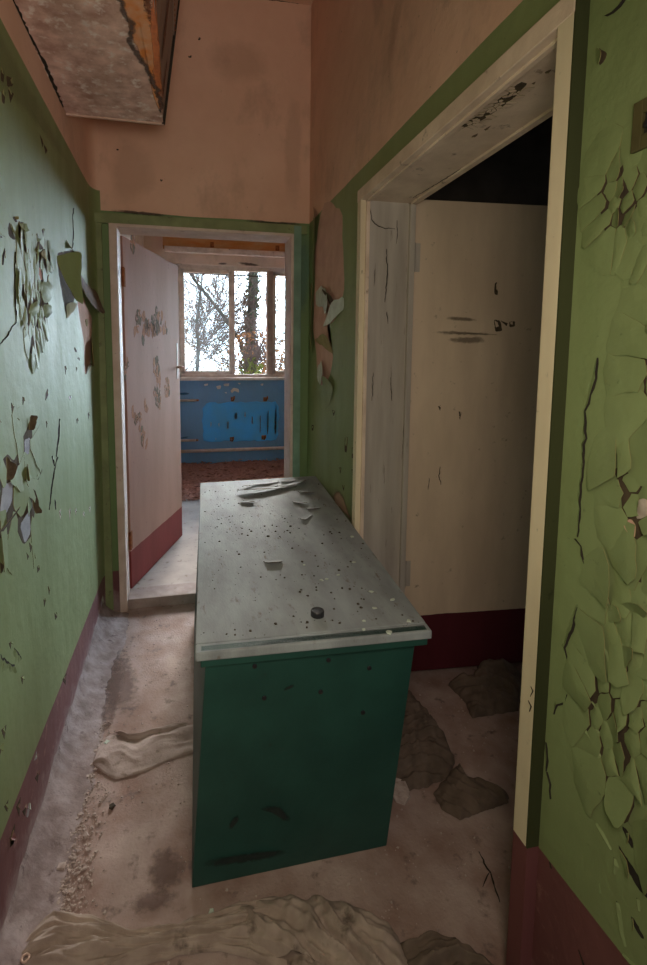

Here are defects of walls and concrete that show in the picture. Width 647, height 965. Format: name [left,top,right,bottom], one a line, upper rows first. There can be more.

crack [605,0,625,16]
crack [0,252,17,345]
peeling [0,216,105,375]
peeling [310,202,344,416]
peeling [0,397,48,574]
peeling [562,121,647,898]